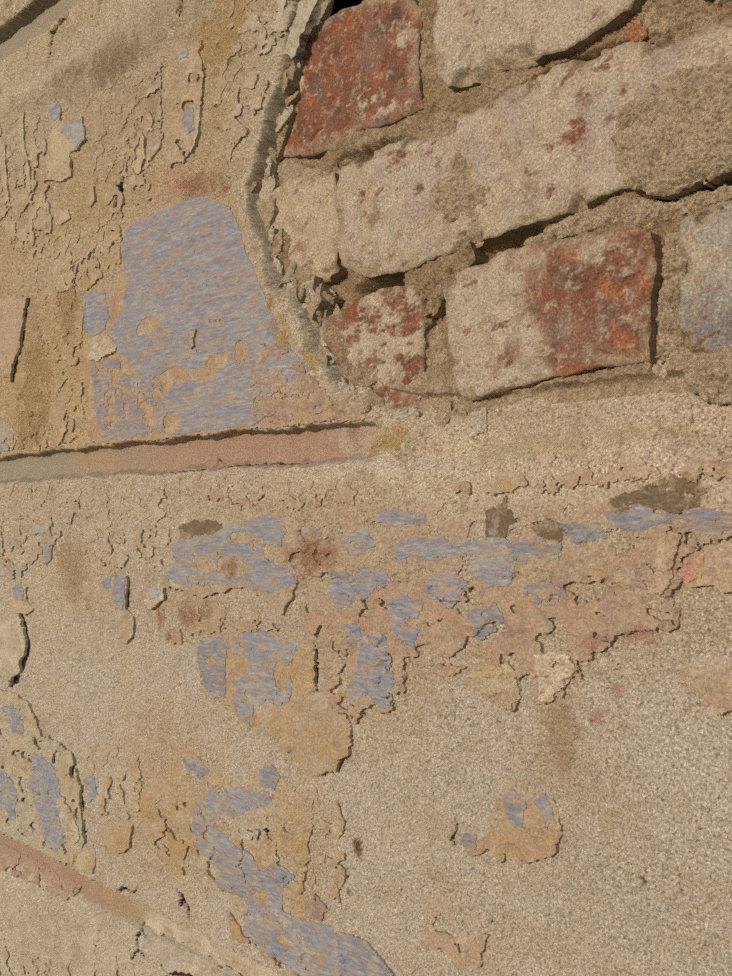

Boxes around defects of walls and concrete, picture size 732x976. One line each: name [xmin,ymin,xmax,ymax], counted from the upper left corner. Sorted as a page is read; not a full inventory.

flaking render [0,0,732,453]
crack [167,968,193,976]
crack [177,889,190,917]
peeling [0,443,732,976]